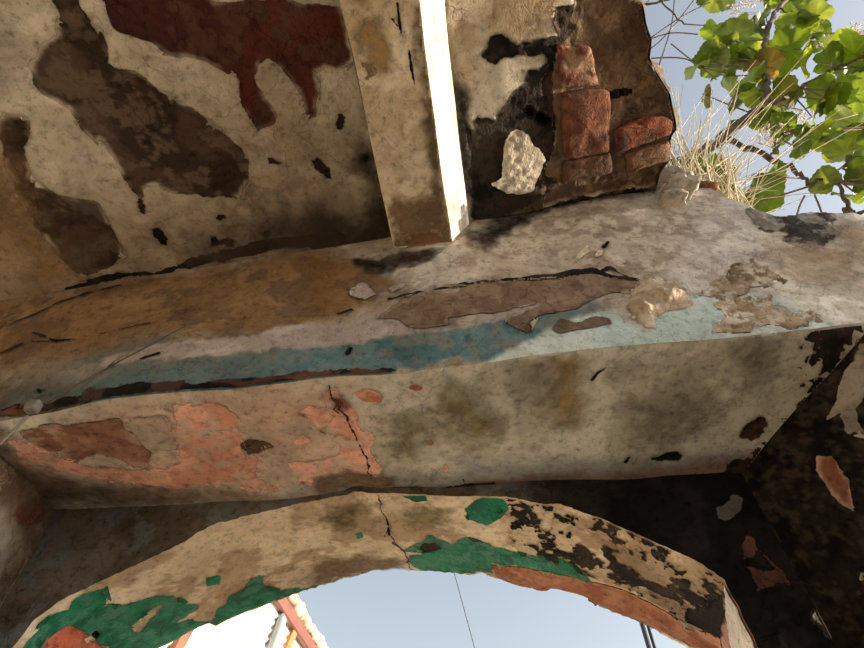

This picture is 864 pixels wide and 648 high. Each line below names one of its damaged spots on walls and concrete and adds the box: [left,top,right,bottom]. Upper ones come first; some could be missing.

spalling [491,0,719,209]
crack [0,232,347,354]
peeling [376,275,637,333]
peeling [8,402,279,496]
spalling [40,368,396,412]
peeling [287,390,383,485]
crack [328,385,424,570]
crack [446,481,489,489]
spalling [816,456,854,512]
peeling [826,343,864,438]
peeling [23,575,319,648]
water stain [497,498,726,648]